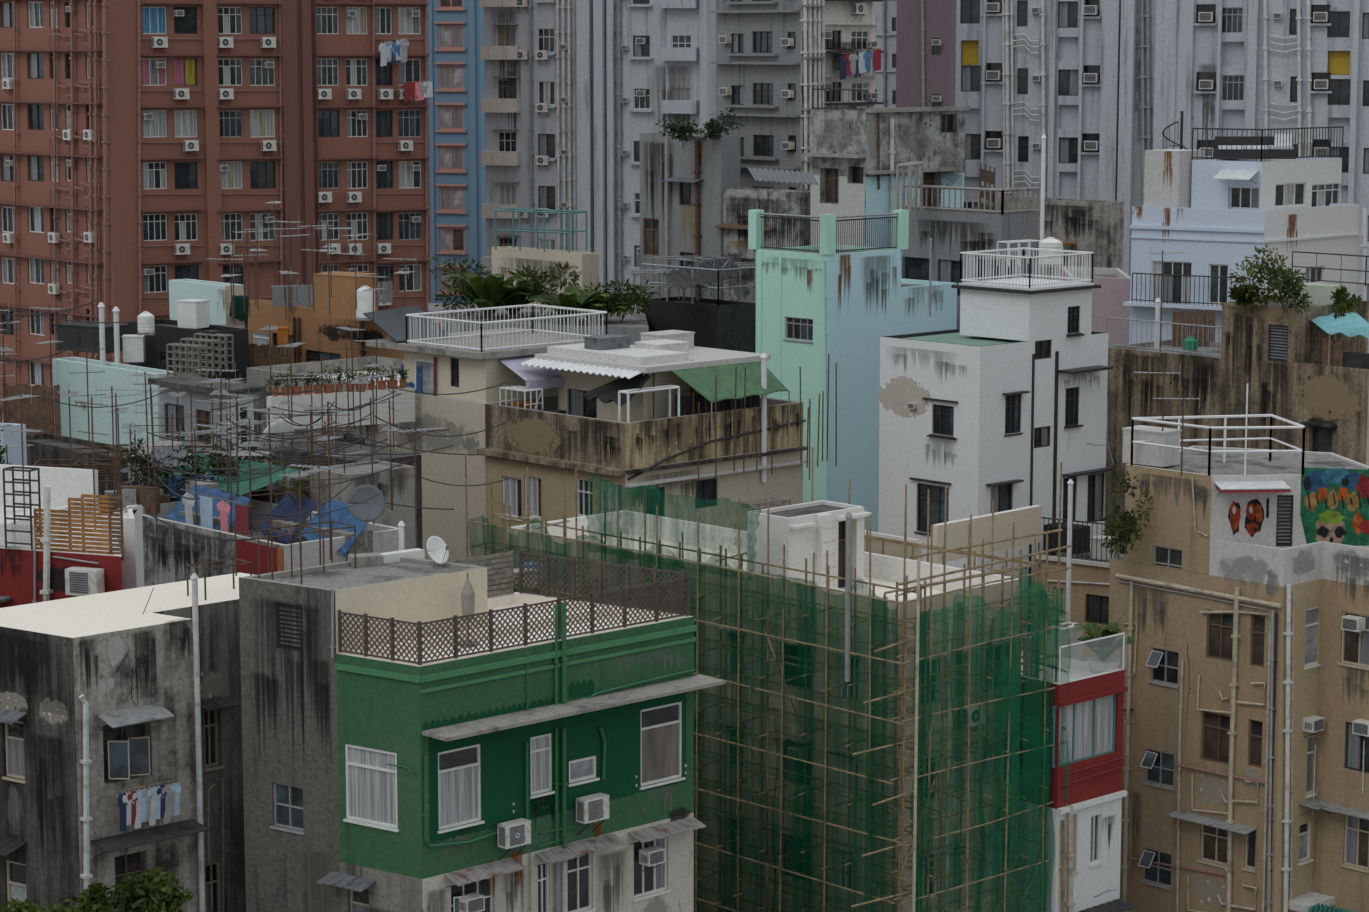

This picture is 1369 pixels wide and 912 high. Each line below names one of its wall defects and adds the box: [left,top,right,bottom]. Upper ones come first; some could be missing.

rust [838,255,851,312]
water stain [1124,354,1211,422]
water stain [569,420,616,461]
water stain [255,602,327,741]